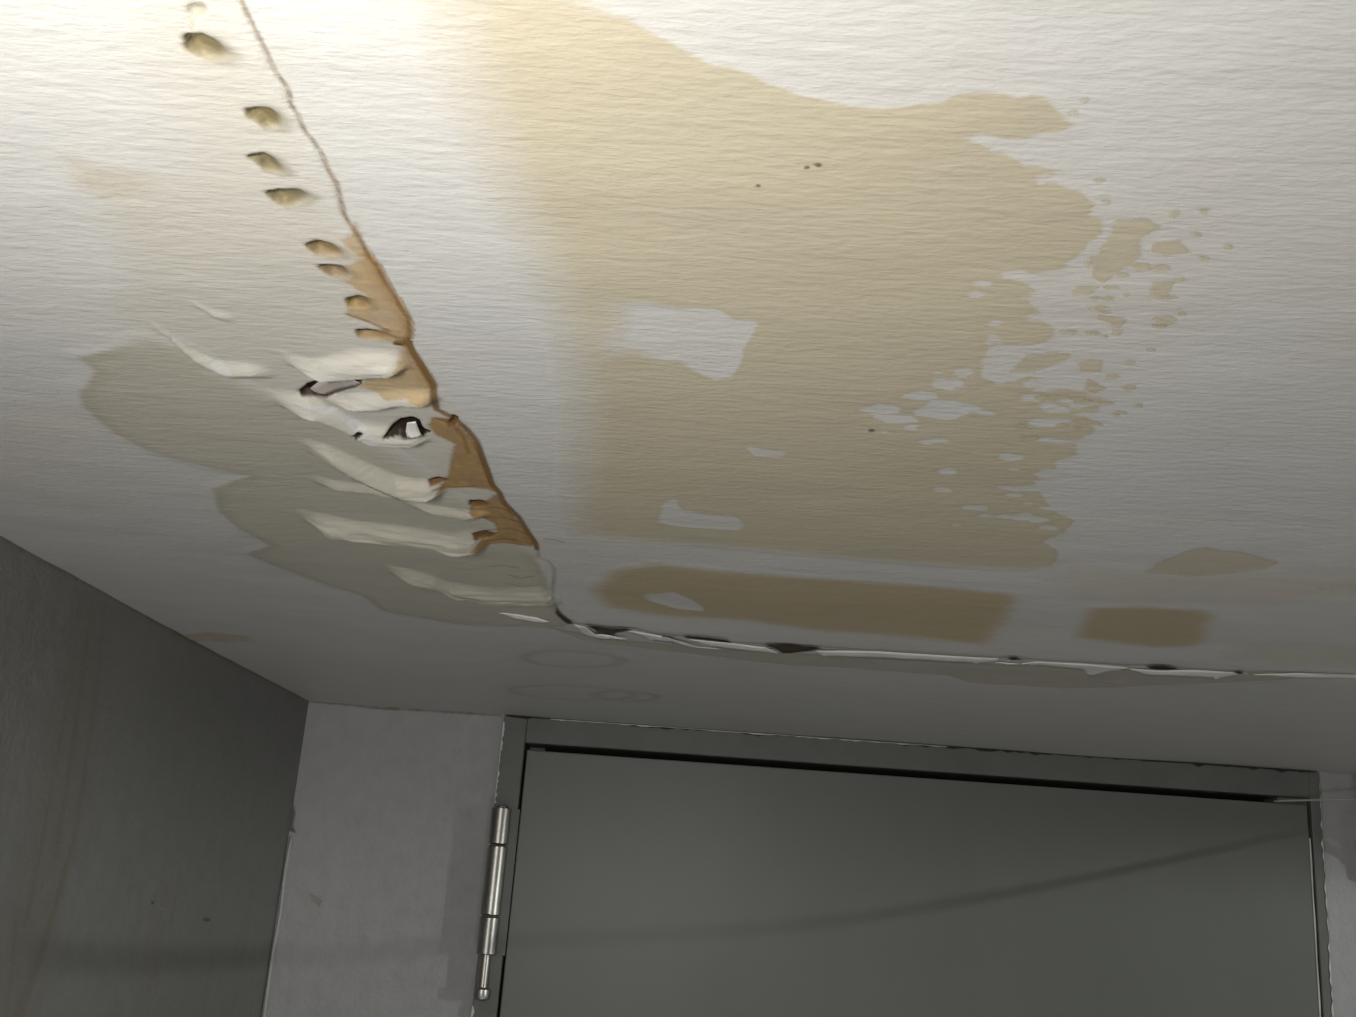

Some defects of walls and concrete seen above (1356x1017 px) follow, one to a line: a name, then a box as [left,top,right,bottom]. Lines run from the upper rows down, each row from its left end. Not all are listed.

hole [305,240,349,276]
hole [345,295,370,309]
hole [355,328,394,339]
leakage [31,0,1304,688]
spalling [300,381,333,397]
hole [383,416,430,440]
crack [397,301,539,550]
peeling [500,613,550,623]
crack [556,608,819,653]
crack [1148,664,1187,672]